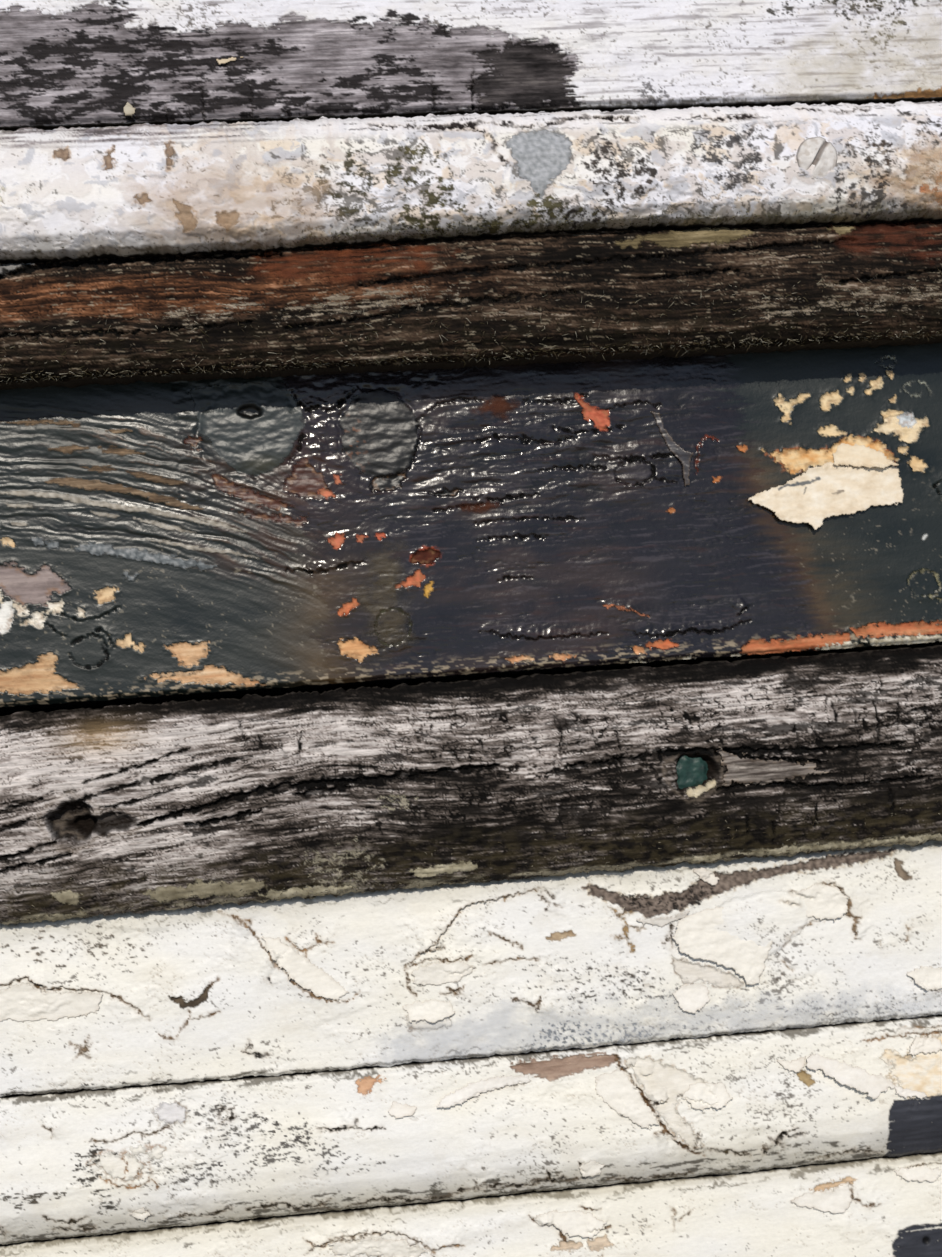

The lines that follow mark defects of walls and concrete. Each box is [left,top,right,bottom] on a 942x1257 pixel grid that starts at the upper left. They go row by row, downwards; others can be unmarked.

peeling [0,1,583,127]
peeling [748,371,929,530]
peeling [0,537,217,634]
peeling [0,652,79,695]
peeling [151,641,266,688]
crack [232,915,357,1003]
crack [405,889,554,996]
crack [614,909,635,952]
crack [825,883,861,939]
crack [1,977,220,1040]
peeling [437,1052,704,1150]
crack [614,1054,803,1181]